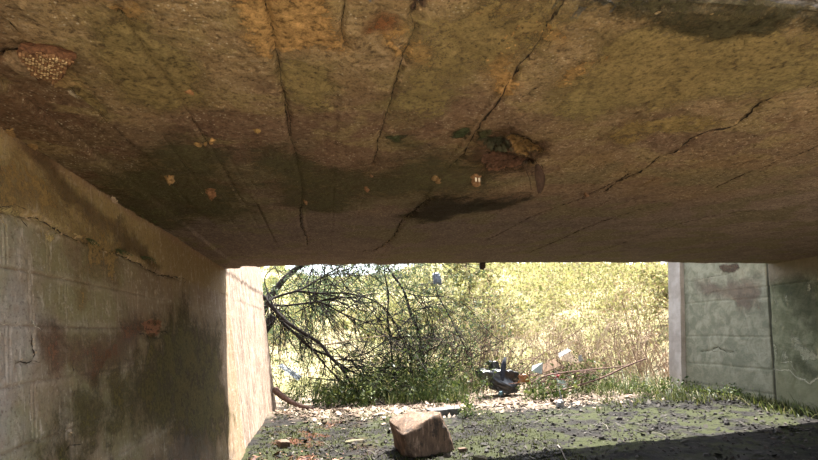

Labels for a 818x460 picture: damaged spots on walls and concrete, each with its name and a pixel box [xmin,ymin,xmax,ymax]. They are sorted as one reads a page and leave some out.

crack [265,3,299,170]
crack [370,1,422,163]
damp [399,195,533,224]
crack [486,94,777,240]